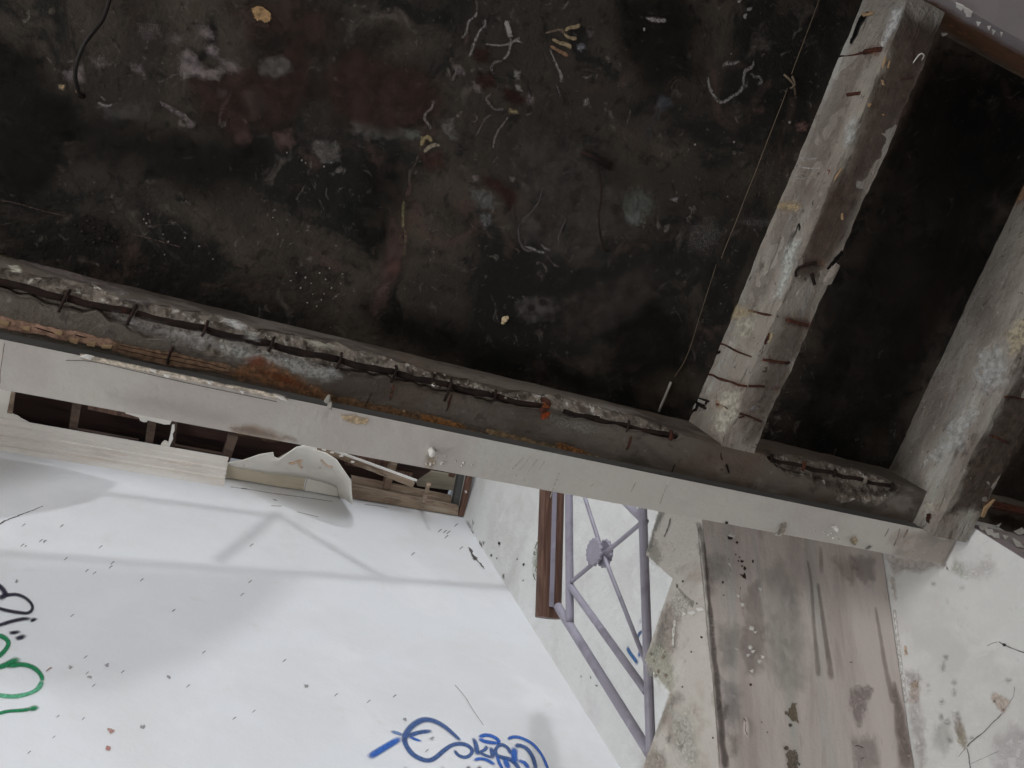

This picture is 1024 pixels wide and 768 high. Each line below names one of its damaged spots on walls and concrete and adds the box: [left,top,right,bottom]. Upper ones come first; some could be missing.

rust [839,47,883,57]
rust [748,310,809,328]
spalling [0,268,684,441]
rust [720,333,790,365]
rust [0,315,613,460]
rust [707,373,778,390]
spalling [764,452,899,506]